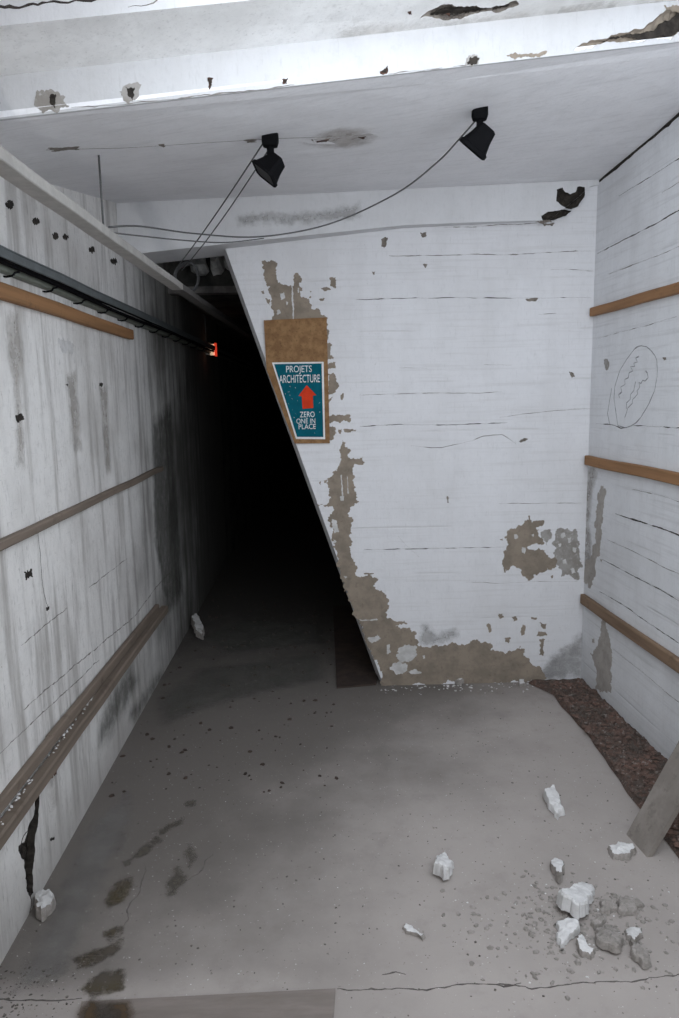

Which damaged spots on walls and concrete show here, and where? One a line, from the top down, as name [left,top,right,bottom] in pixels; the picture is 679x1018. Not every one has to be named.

crack [0,0,96,9]
spalling [408,1,519,20]
spalling [573,5,679,51]
peeling [261,260,344,402]
peeling [317,414,547,695]
peeling [500,486,606,588]
peeling [590,620,612,693]
crack [18,797,39,911]
damp [106,877,132,906]
damp [74,926,124,996]
crack [338,971,679,991]